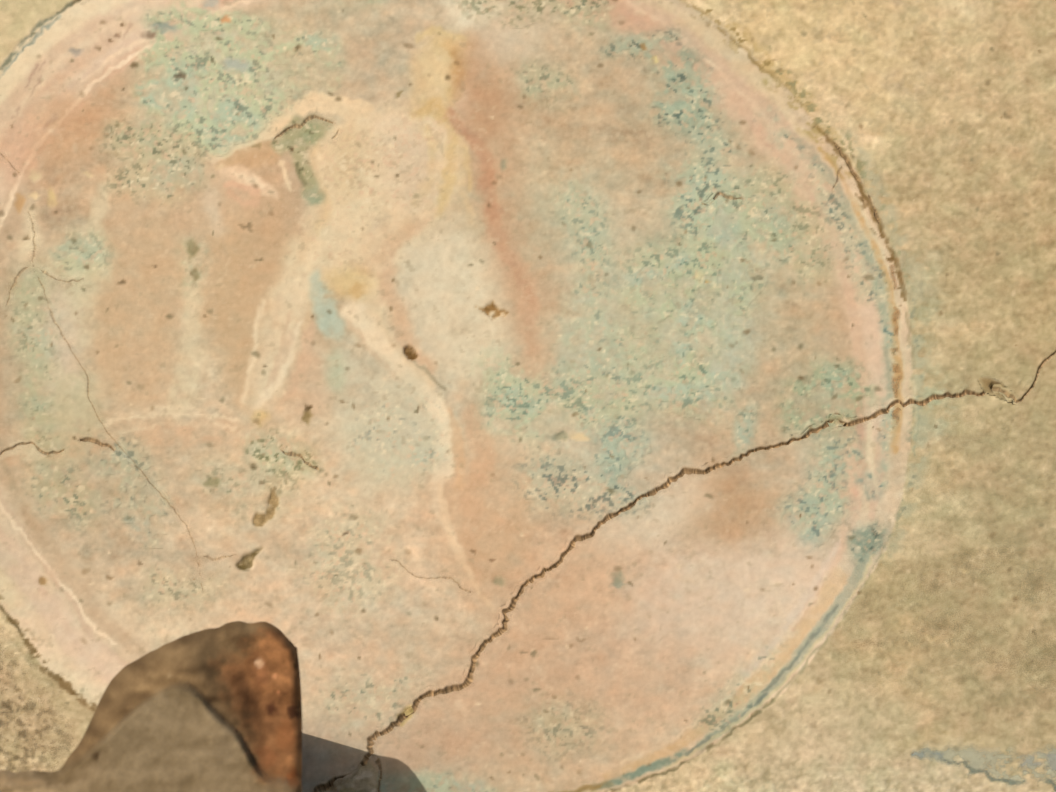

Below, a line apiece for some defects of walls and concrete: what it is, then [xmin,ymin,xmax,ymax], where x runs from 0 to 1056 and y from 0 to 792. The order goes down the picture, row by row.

crack [0,145,24,178]
crack [0,208,238,594]
crack [308,346,1056,792]